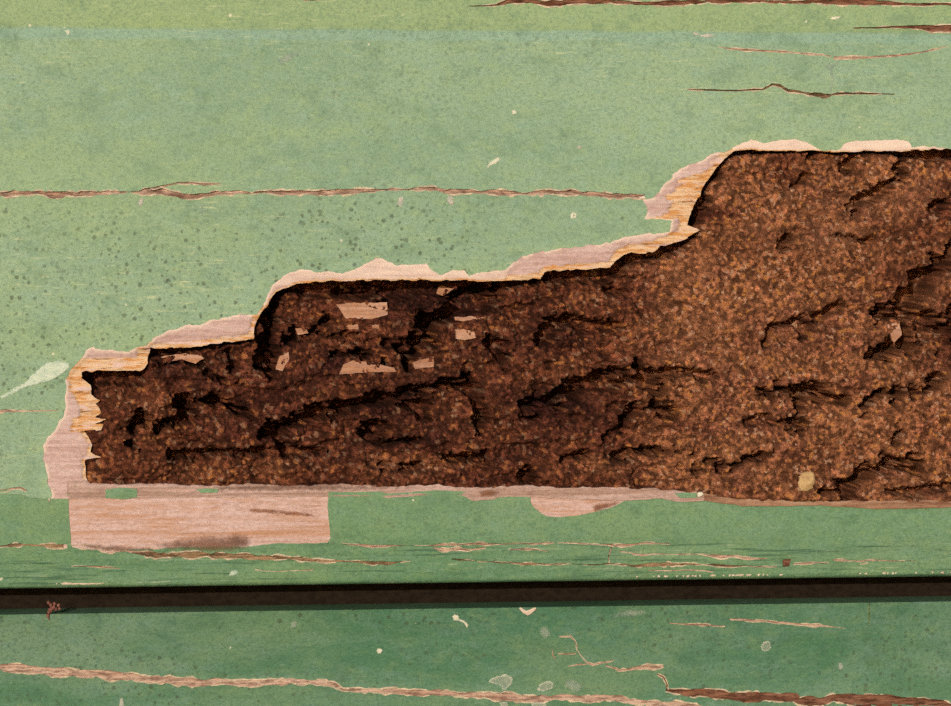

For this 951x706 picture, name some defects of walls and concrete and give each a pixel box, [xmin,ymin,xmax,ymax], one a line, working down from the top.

crack [472,0,951,60]
crack [687,83,894,99]
crack [0,181,645,200]
peeling [43,139,951,553]
crack [0,541,916,573]
crack [0,635,951,706]